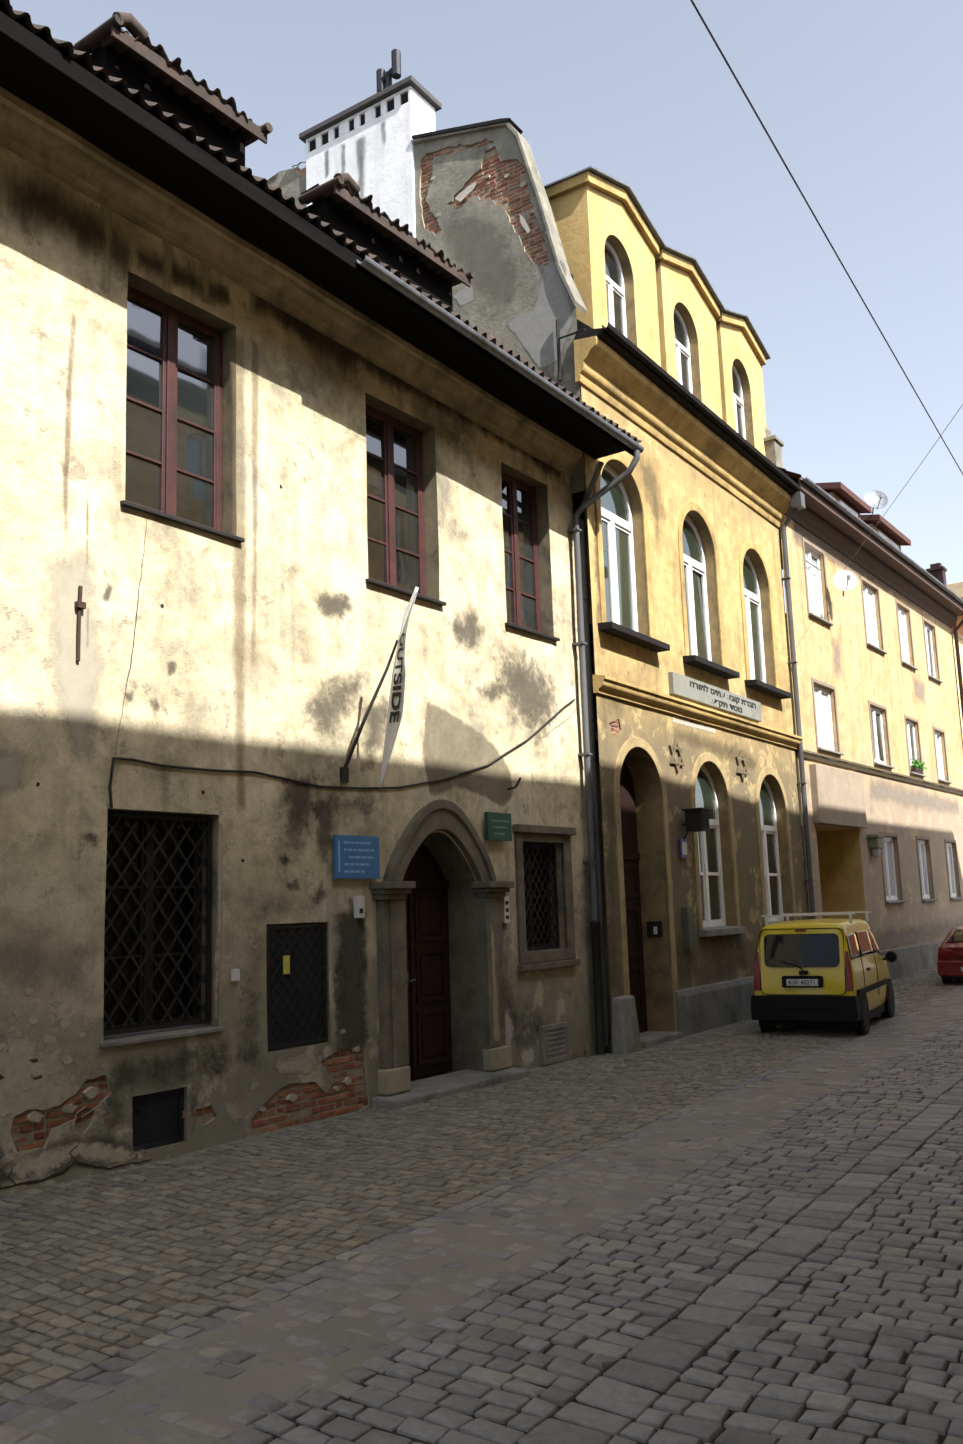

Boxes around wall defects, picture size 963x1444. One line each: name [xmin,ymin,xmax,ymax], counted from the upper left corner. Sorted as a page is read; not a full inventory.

flaking render [421,139,550,266]
flaking render [0,987,145,1180]
flaking render [250,1029,368,1135]